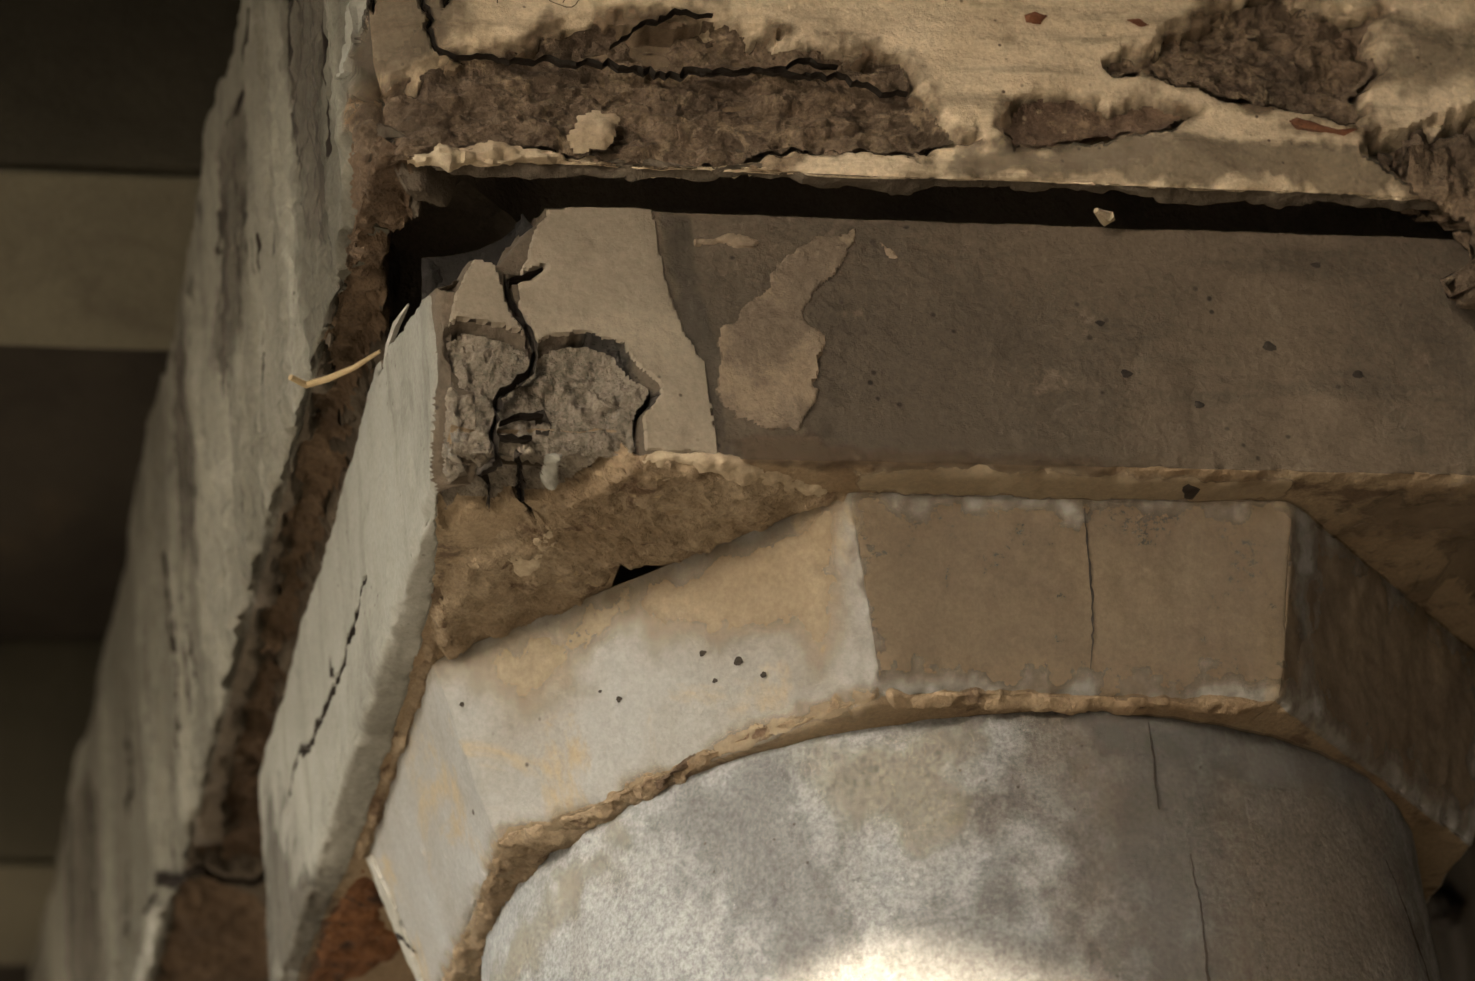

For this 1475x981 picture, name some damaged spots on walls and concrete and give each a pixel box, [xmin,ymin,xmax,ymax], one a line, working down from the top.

crack [287,0,332,180]
crack [420,0,908,98]
spalling [1004,99,1183,147]
spalling [1105,0,1375,124]
spalling [1377,117,1475,310]
crack [477,267,544,515]
spalling [196,21,954,862]
crack [288,578,367,806]
corrosion [307,451,1293,981]
spalling [108,875,269,981]
crack [144,865,266,914]
peeling [365,854,423,981]